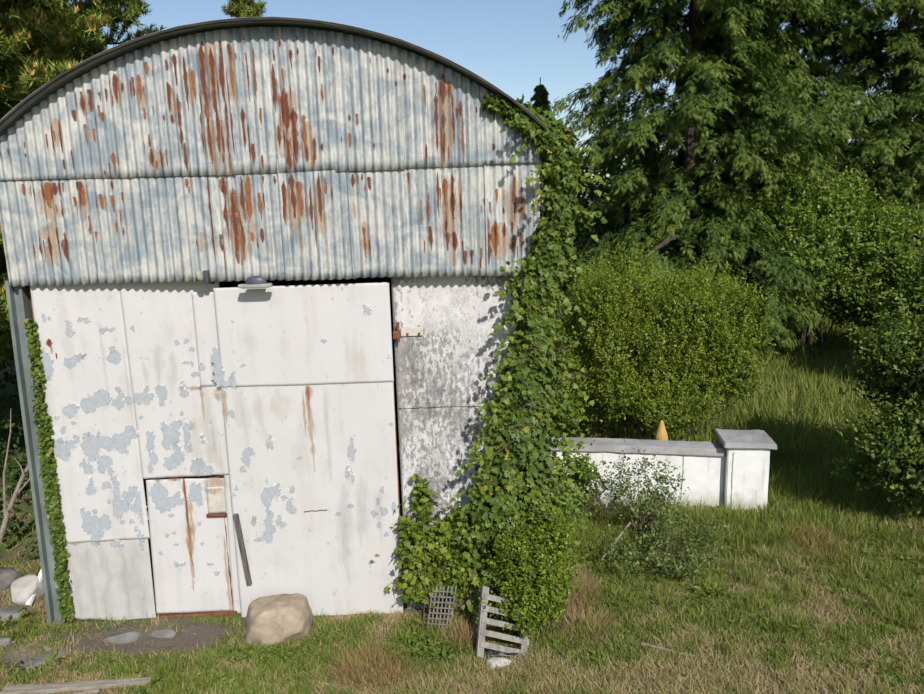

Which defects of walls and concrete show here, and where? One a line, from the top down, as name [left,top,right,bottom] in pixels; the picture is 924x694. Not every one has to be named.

corrosion [45,119,74,169]
corrosion [72,37,333,277]
corrosion [420,74,543,268]
corrosion [22,182,69,264]
peeling [40,348,87,381]
peeling [53,339,246,551]
peeling [240,447,257,472]
peeling [345,435,356,485]
corrosion [172,478,194,570]
peeling [251,482,297,544]